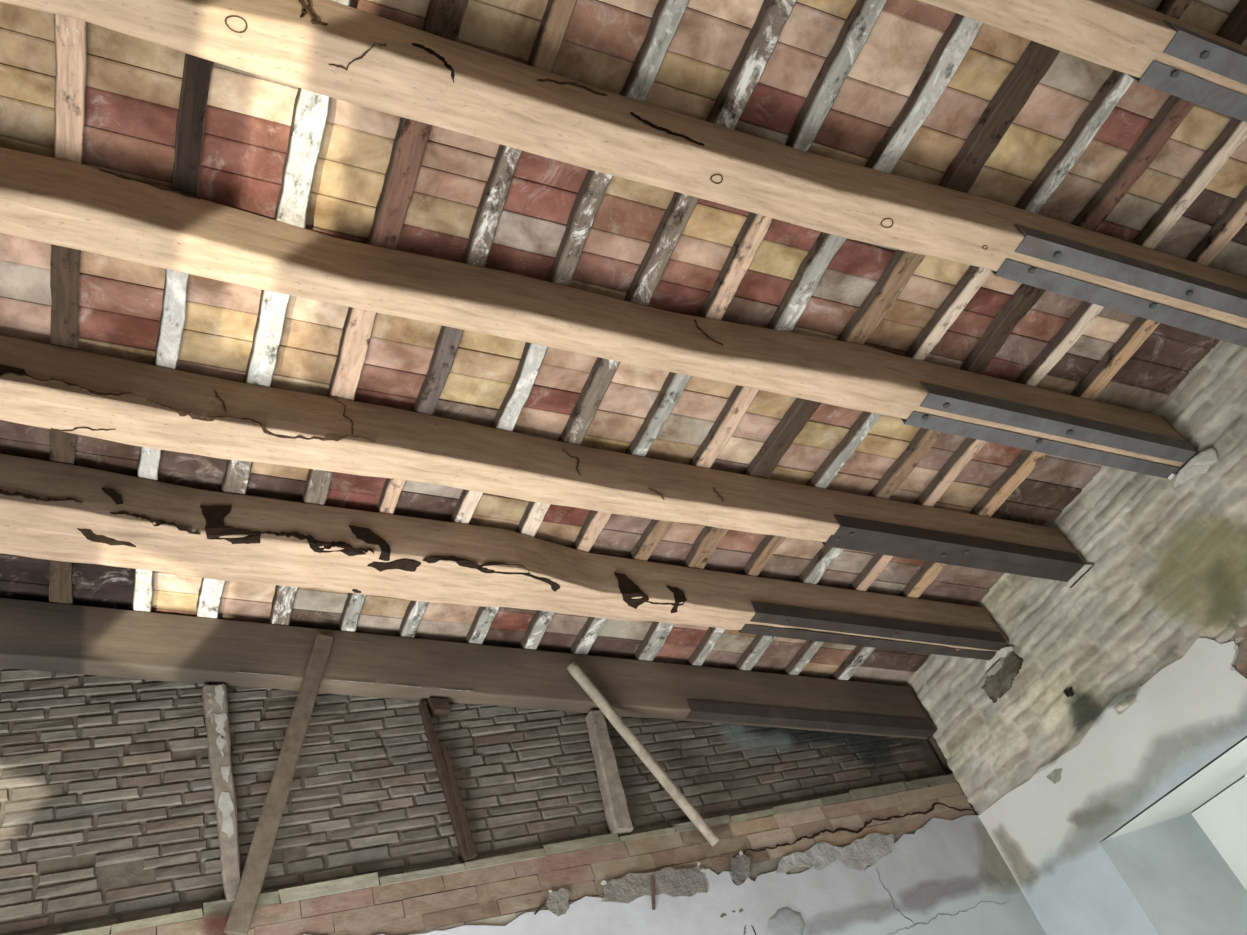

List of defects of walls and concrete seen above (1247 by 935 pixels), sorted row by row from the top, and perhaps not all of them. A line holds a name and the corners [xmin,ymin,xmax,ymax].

crack [298,0,328,26]
crack [537,78,705,146]
crack [24,373,375,443]
crack [0,489,201,535]
crack [261,531,374,554]
spalling [1214,609,1247,677]
spalling [1046,768,1063,784]
crack [743,802,979,854]
spalling [547,888,570,917]
spalling [601,862,708,904]
spalling [730,851,751,886]
spalling [777,833,894,873]